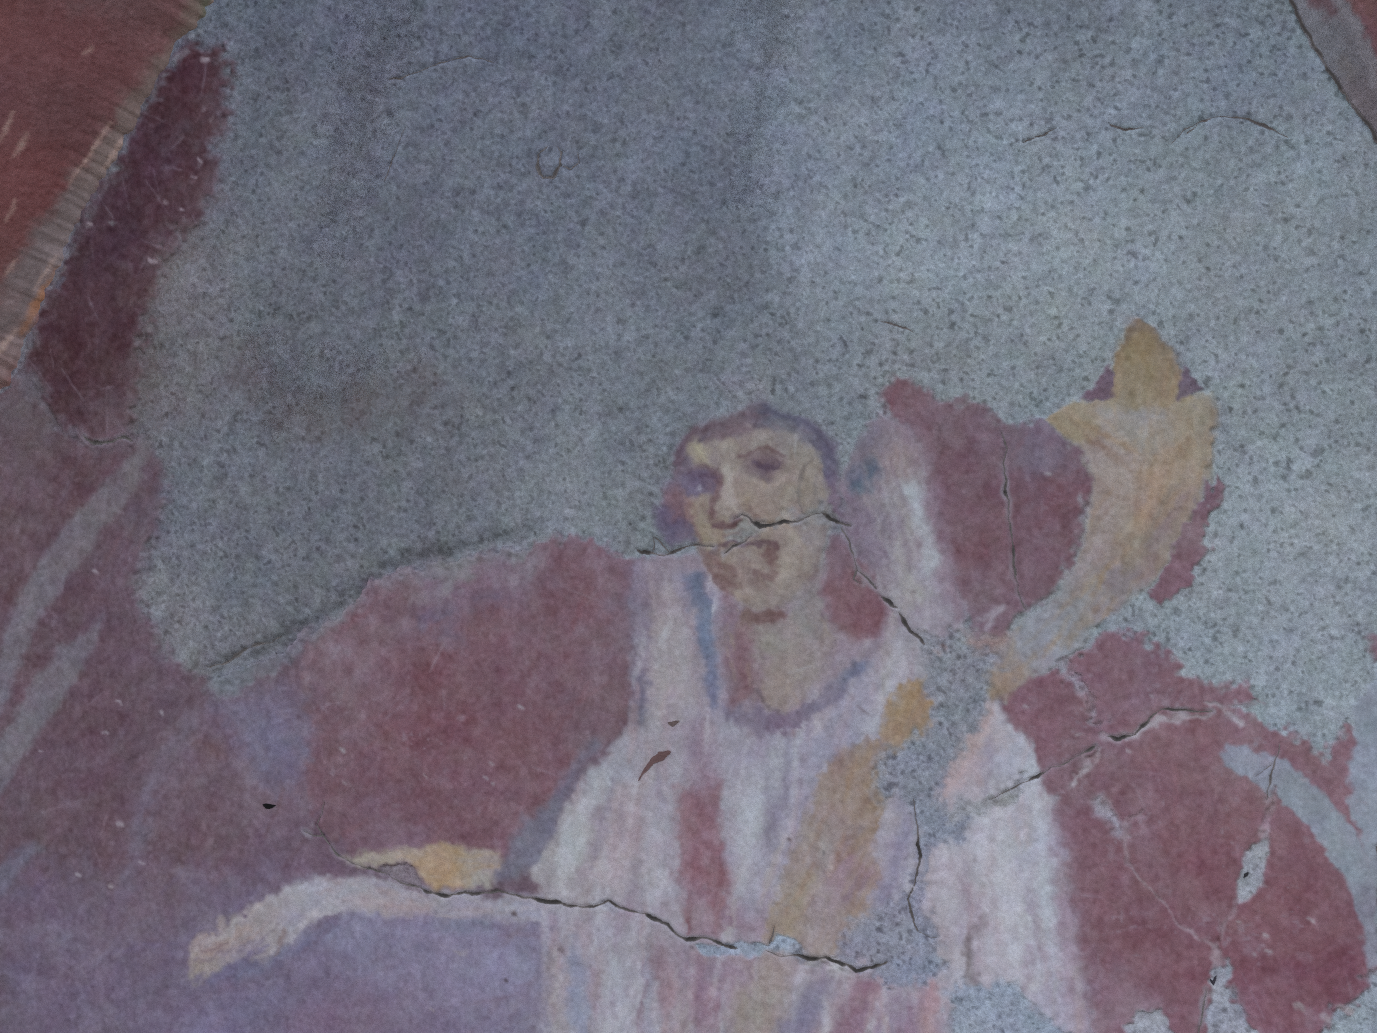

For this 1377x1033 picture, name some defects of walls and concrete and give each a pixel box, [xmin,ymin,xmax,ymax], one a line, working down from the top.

flaking render [0,0,1377,764]
crack [637,512,925,645]
flaking render [836,495,1093,1033]
crack [989,708,1212,800]
crack [1258,744,1280,798]
flaking render [1092,795,1124,841]
crack [306,804,888,973]
crack [907,798,937,938]
flaking render [1238,831,1270,904]
flaking render [1123,1009,1175,1033]
flaking render [1205,958,1258,1033]
flaking render [1323,969,1377,1033]